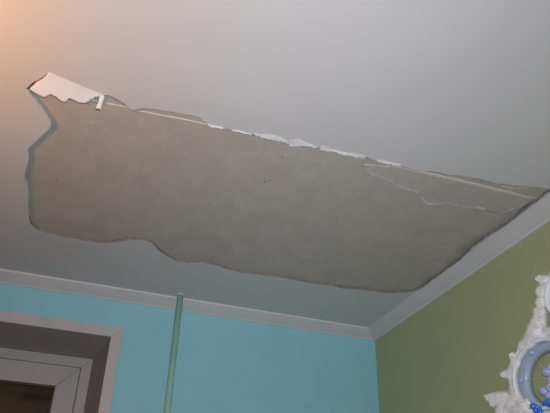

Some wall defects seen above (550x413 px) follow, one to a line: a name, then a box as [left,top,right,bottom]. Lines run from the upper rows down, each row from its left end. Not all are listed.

crack [140,111,207,125]
spalling [24,72,550,294]
crack [416,170,537,199]